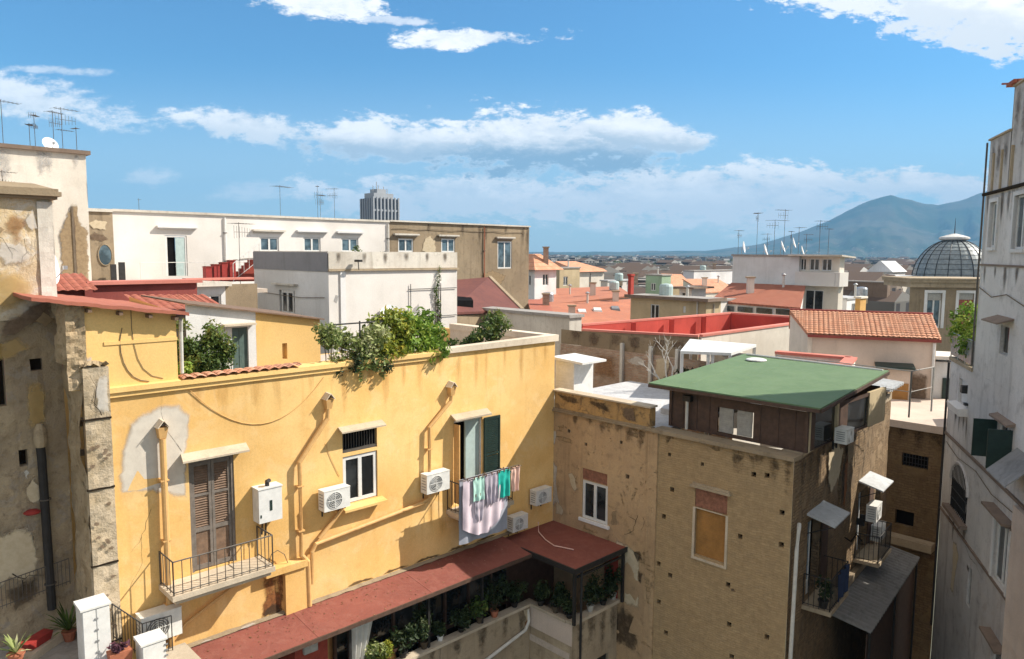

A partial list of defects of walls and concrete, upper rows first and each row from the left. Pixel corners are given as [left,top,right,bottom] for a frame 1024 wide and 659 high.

flaking render [26,211,37,230]
flaking render [0,227,30,264]
damp [561,396,608,411]
damp [618,408,643,442]
flaking render [90,406,189,495]